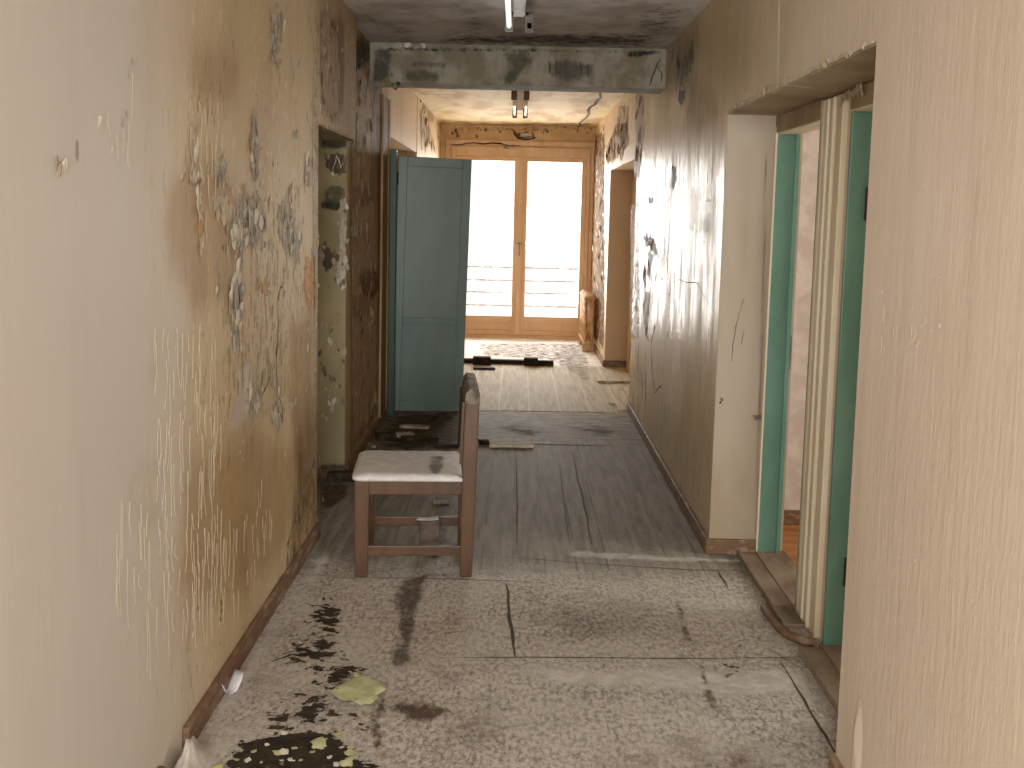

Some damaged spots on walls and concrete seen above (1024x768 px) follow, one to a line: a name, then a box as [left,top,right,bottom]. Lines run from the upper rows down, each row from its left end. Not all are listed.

damp [356,37,438,100]
damp [451,33,654,82]
crack [579,93,602,127]
peeling [180,0,349,581]
peeling [450,93,644,349]
peeling [630,193,672,343]
damp [116,325,272,680]